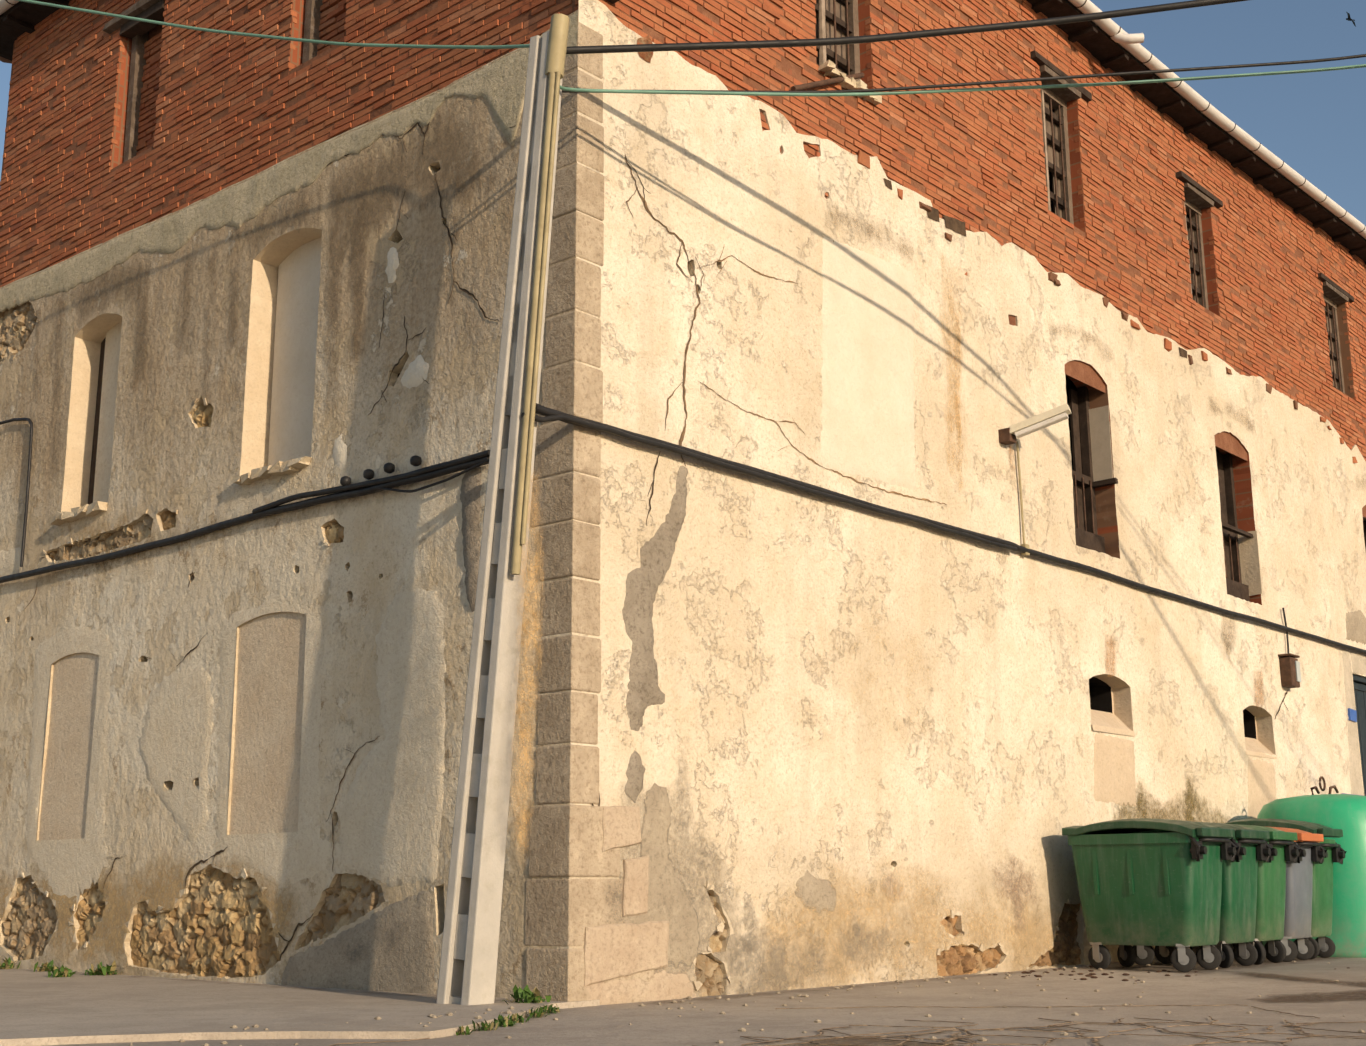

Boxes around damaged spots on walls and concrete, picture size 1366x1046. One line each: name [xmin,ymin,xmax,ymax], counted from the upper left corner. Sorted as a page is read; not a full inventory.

damp [329,114,494,354]
crack [393,108,499,321]
spalling [927,205,966,236]
damp [79,266,149,375]
crack [370,295,429,414]
crack [625,155,947,523]
crack [328,736,380,870]
flaking render [0,873,106,961]
flaking render [122,866,281,978]
flaking render [297,873,385,947]
flaking render [936,910,1002,976]
crack [740,1016,1366,1046]